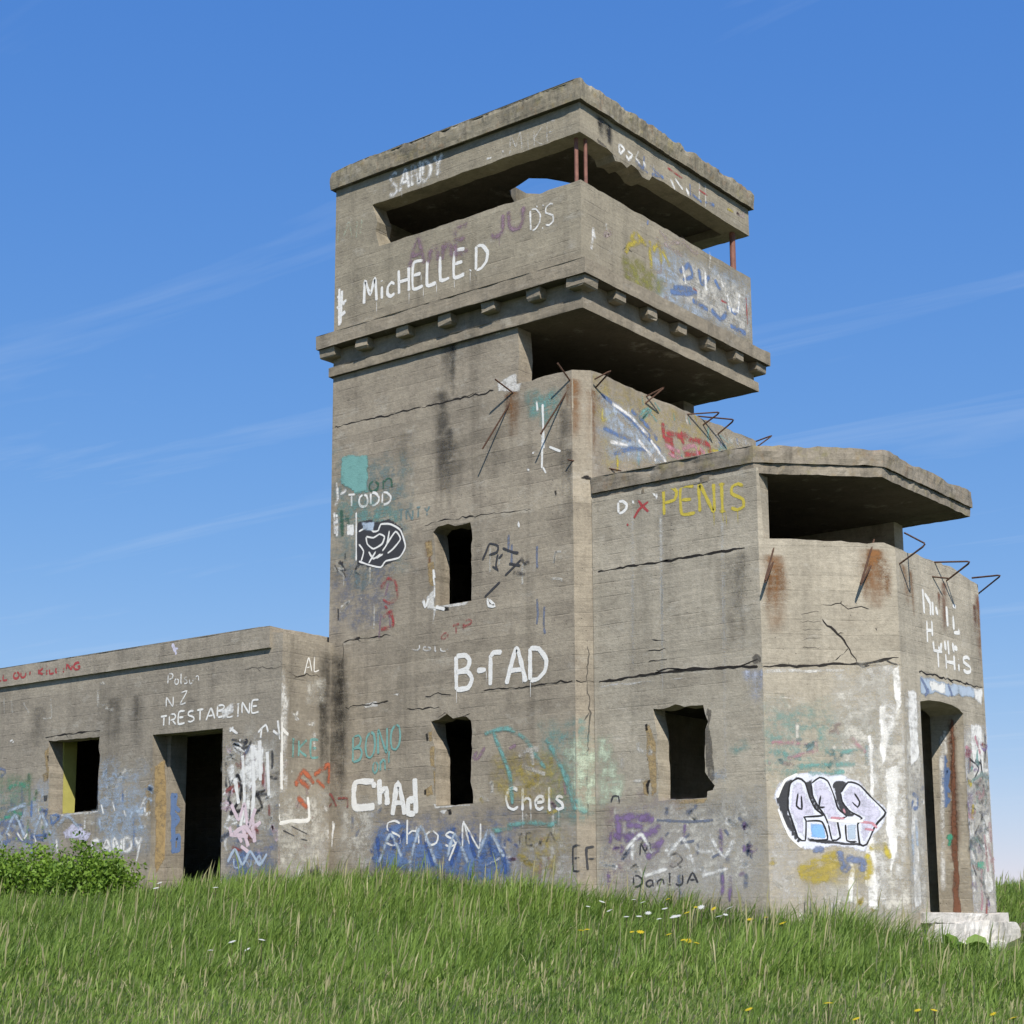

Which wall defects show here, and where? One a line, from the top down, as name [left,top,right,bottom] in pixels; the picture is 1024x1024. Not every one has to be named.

crack [335,390,493,428]
crack [598,547,744,572]
corrosion [864,550,889,590]
crack [246,634,470,770]
crack [484,601,982,810]